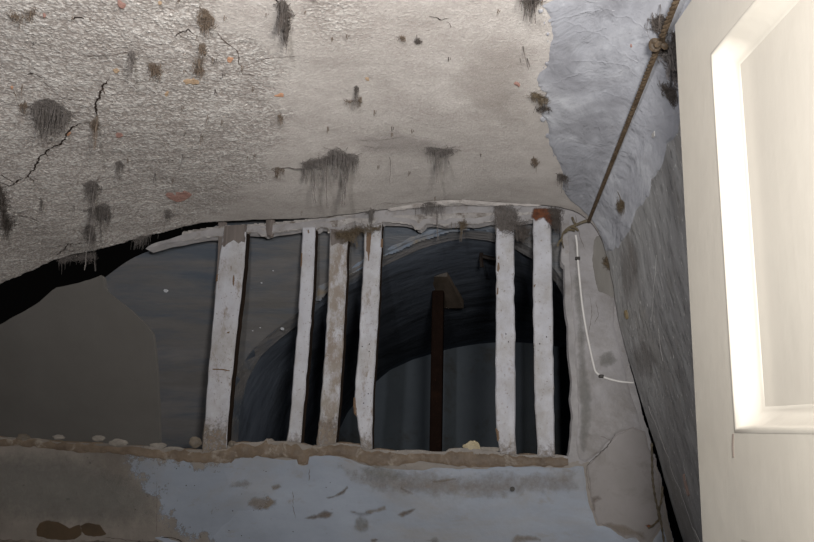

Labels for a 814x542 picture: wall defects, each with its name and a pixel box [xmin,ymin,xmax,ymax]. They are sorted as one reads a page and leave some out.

crack [0,79,109,186]
flaking render [536,0,691,251]
corrosion [532,208,554,225]